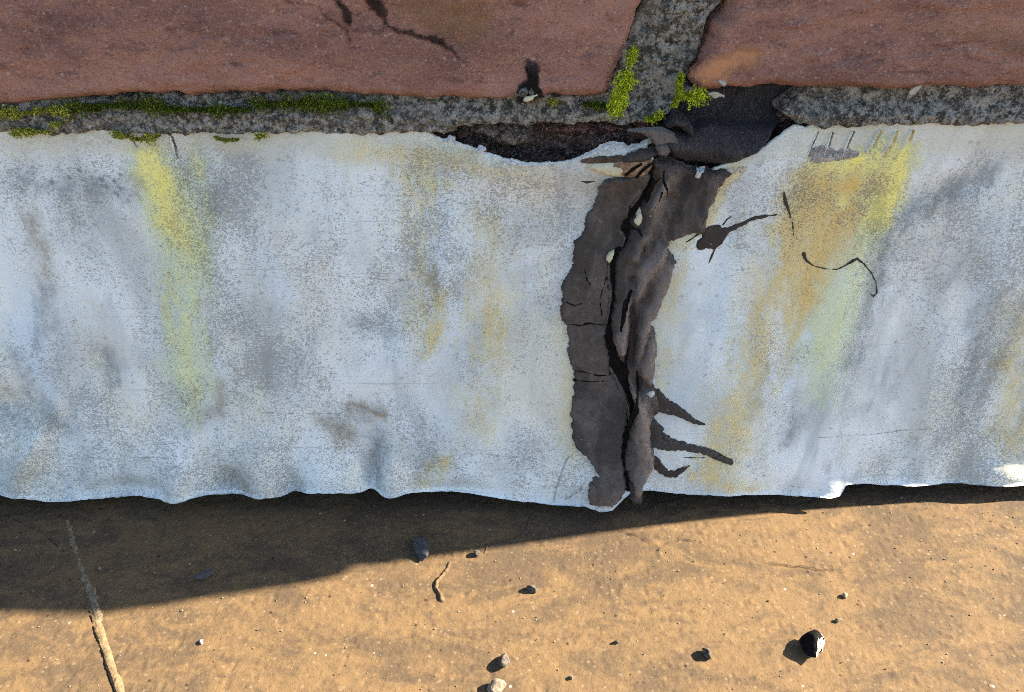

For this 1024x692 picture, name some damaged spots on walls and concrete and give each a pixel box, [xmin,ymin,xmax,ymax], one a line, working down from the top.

crack [324,0,455,54]
spalling [446,121,678,178]